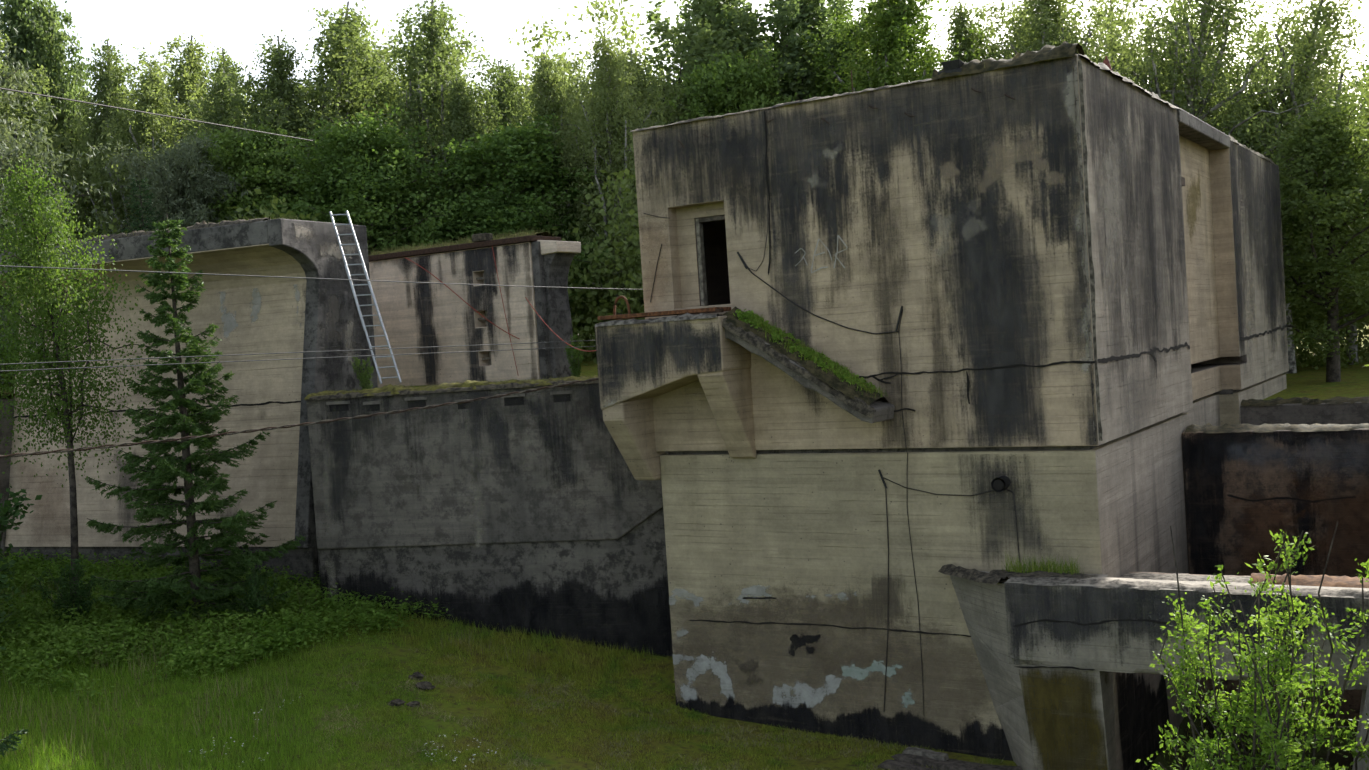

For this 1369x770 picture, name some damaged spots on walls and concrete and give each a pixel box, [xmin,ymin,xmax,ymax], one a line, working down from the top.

damp [404,255,439,385]
damp [464,246,513,477]
damp [589,322,721,425]
damp [644,56,1185,557]
damp [1230,144,1285,360]
damp [673,576,985,733]
damp [1004,429,1369,665]